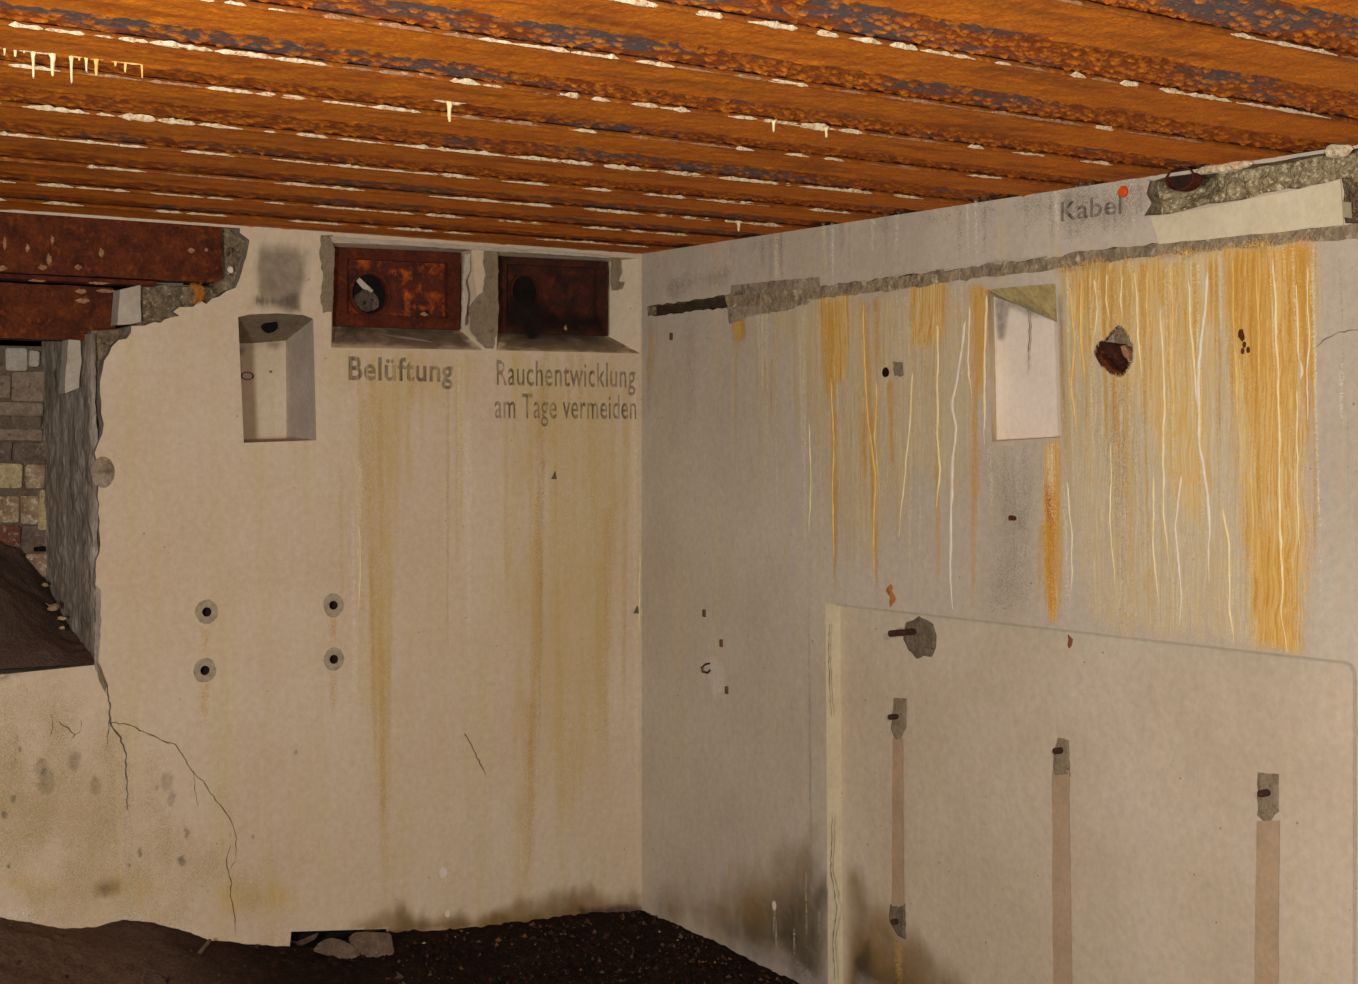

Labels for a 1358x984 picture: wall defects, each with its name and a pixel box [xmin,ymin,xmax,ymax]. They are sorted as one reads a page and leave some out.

damp [81,73,306,100]
damp [9,21,501,88]
damp [322,101,421,113]
damp [632,103,691,112]
damp [728,115,944,144]
spalling [1158,151,1358,215]
spalling [59,225,245,394]
spalling [1098,325,1134,376]
rust [730,263,991,609]
rust [1037,235,1334,658]
spalling [94,586,107,692]
crack [50,664,237,922]